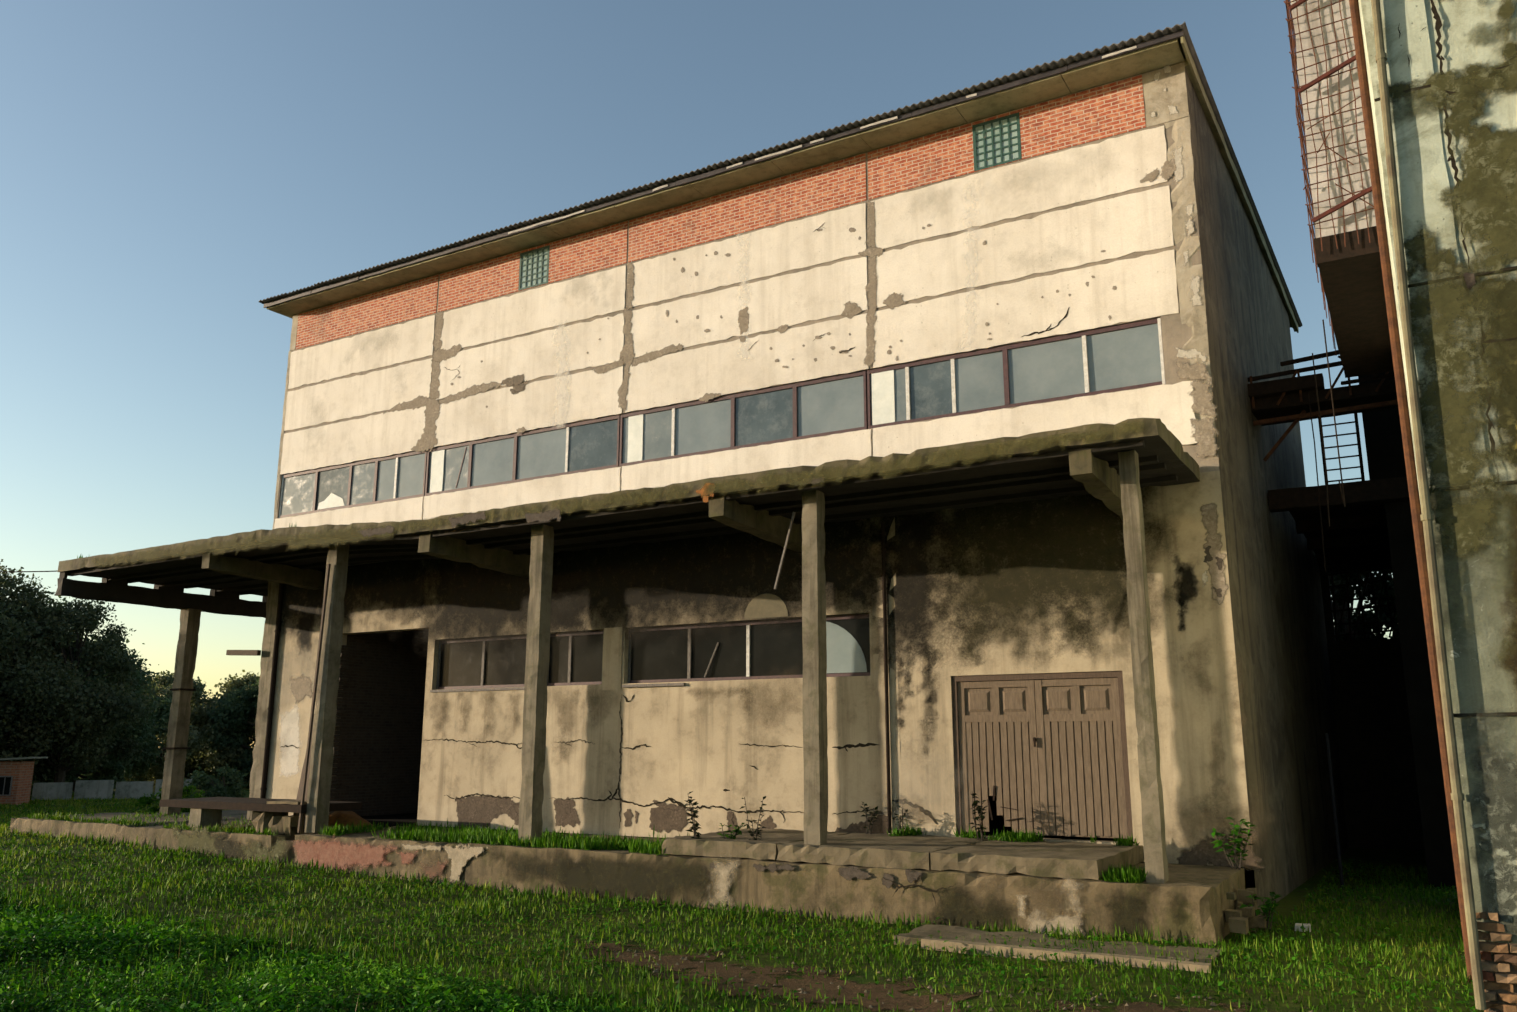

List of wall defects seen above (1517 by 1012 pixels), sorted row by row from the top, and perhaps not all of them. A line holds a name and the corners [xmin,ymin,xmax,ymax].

crack [1398,0,1460,186]
crack [1461,227,1470,266]
water stain [280,569,326,651]
water stain [343,559,530,650]
water stain [550,532,802,643]
water stain [824,494,1130,753]
water stain [1141,486,1172,622]
crack [423,695,878,828]
peeling [214,835,488,882]
peeling [1472,823,1517,866]
flaking render [1476,911,1517,1012]